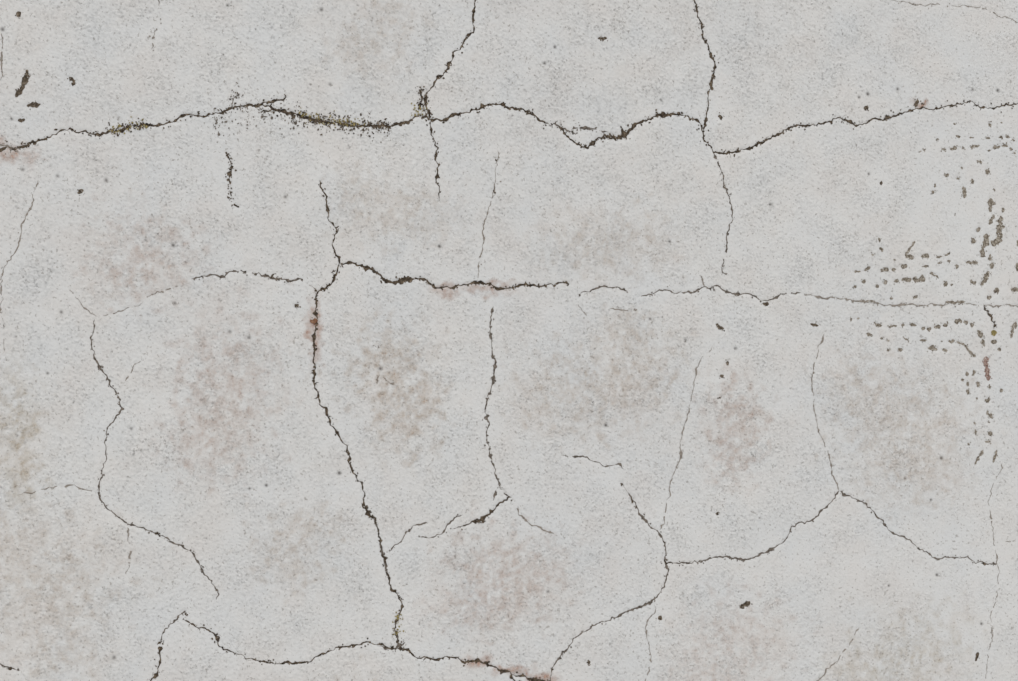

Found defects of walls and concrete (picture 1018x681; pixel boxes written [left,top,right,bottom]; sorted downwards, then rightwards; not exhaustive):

crack [0,183,38,358]
crack [0,0,1018,327]
peeling [852,188,1005,300]
peeling [936,121,1016,175]
crack [18,286,219,599]
crack [150,155,1011,681]
peeling [866,318,1003,464]